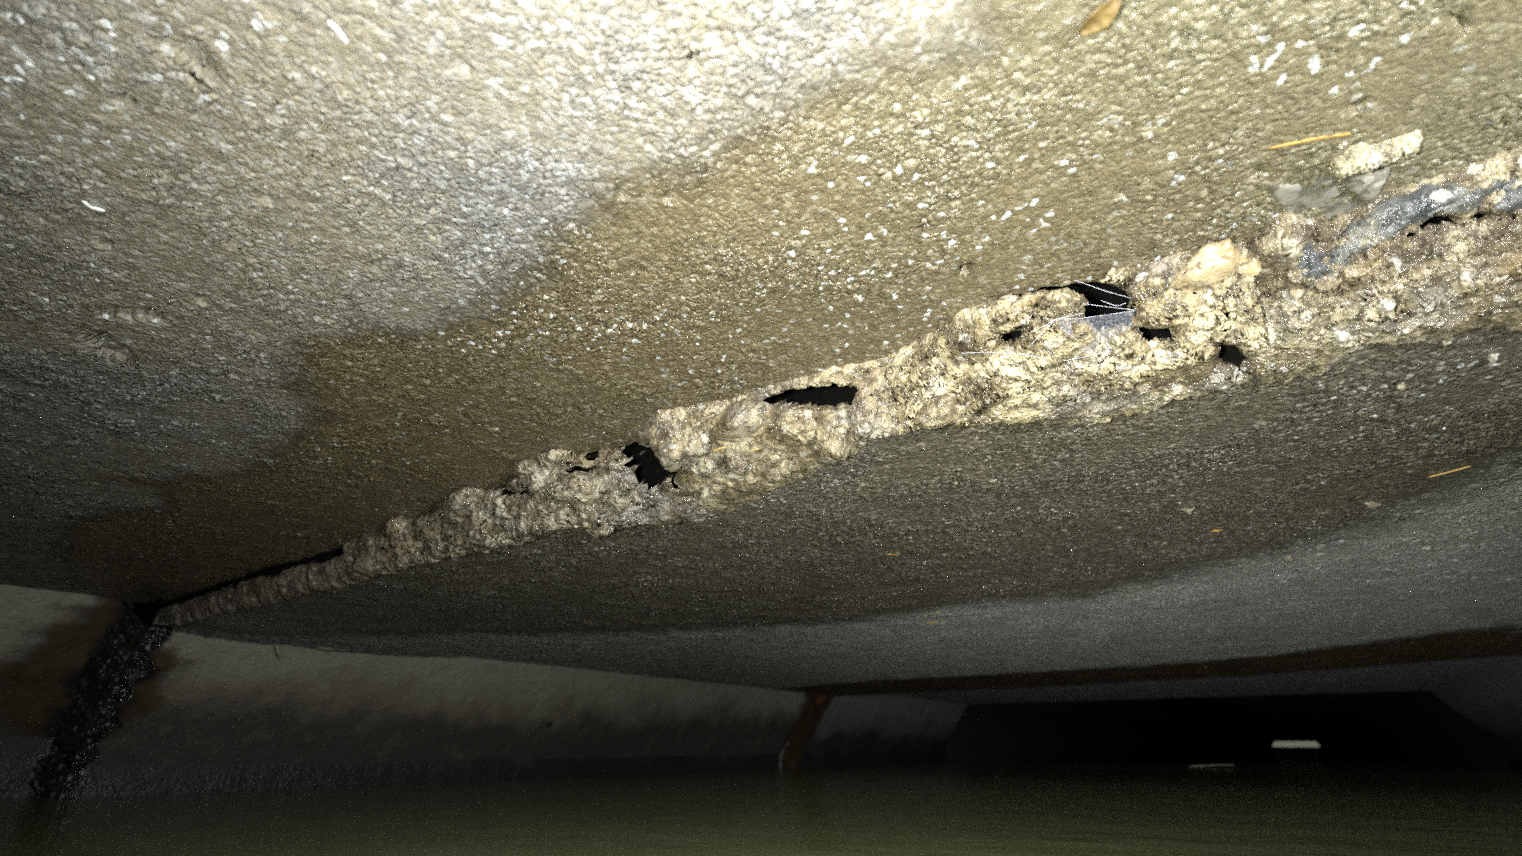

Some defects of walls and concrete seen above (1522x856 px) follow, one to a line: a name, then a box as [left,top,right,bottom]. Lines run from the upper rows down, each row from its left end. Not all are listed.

peeling [1269,130,1423,220]
spalling [1457,268,1477,282]
spalling [1376,297,1396,312]
spalling [1333,330,1354,344]
spalling [1485,353,1500,364]